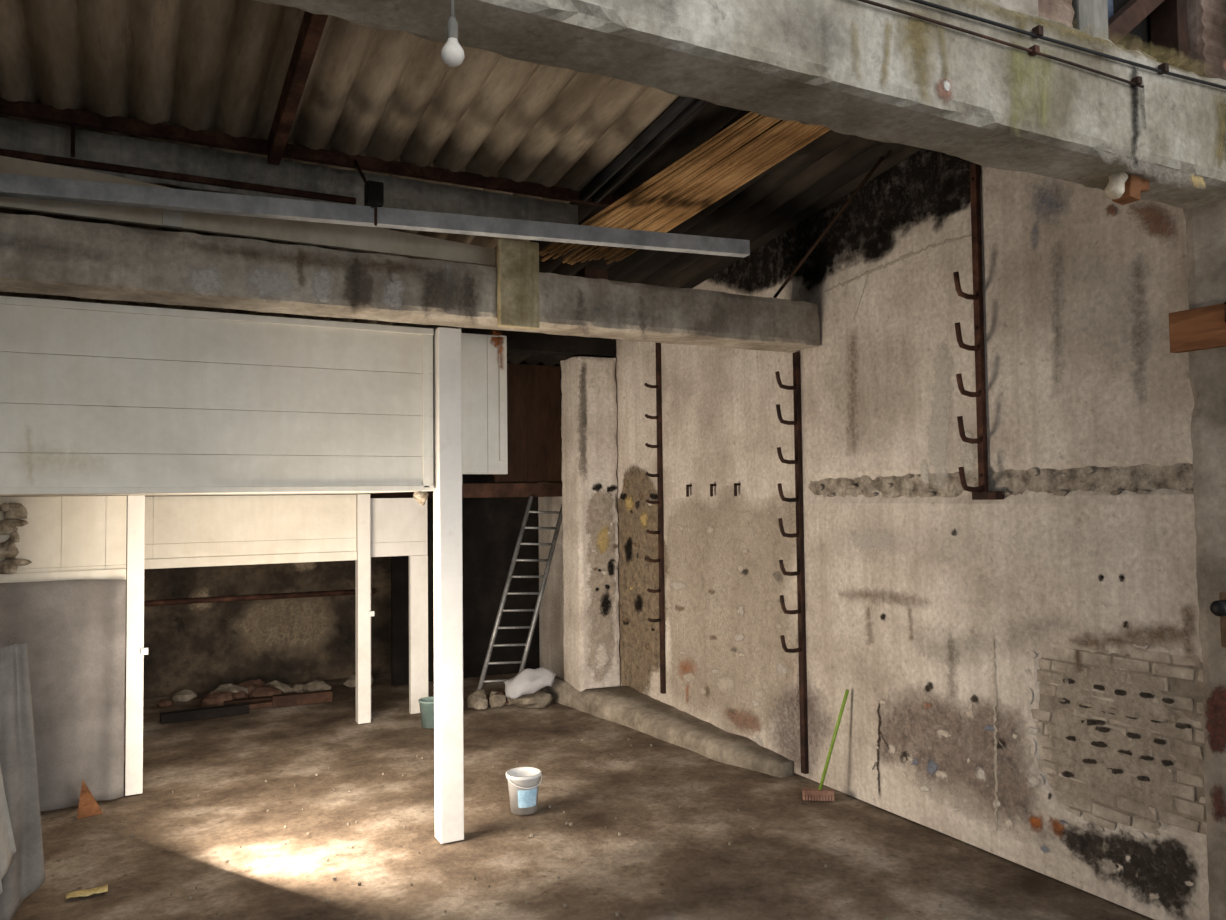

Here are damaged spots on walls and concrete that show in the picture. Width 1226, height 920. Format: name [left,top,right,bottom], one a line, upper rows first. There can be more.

spalling [808,346,1194,498]
flaking render [874,639,1226,838]
peeling [1101,860,1117,873]
damp [1054,824,1197,917]